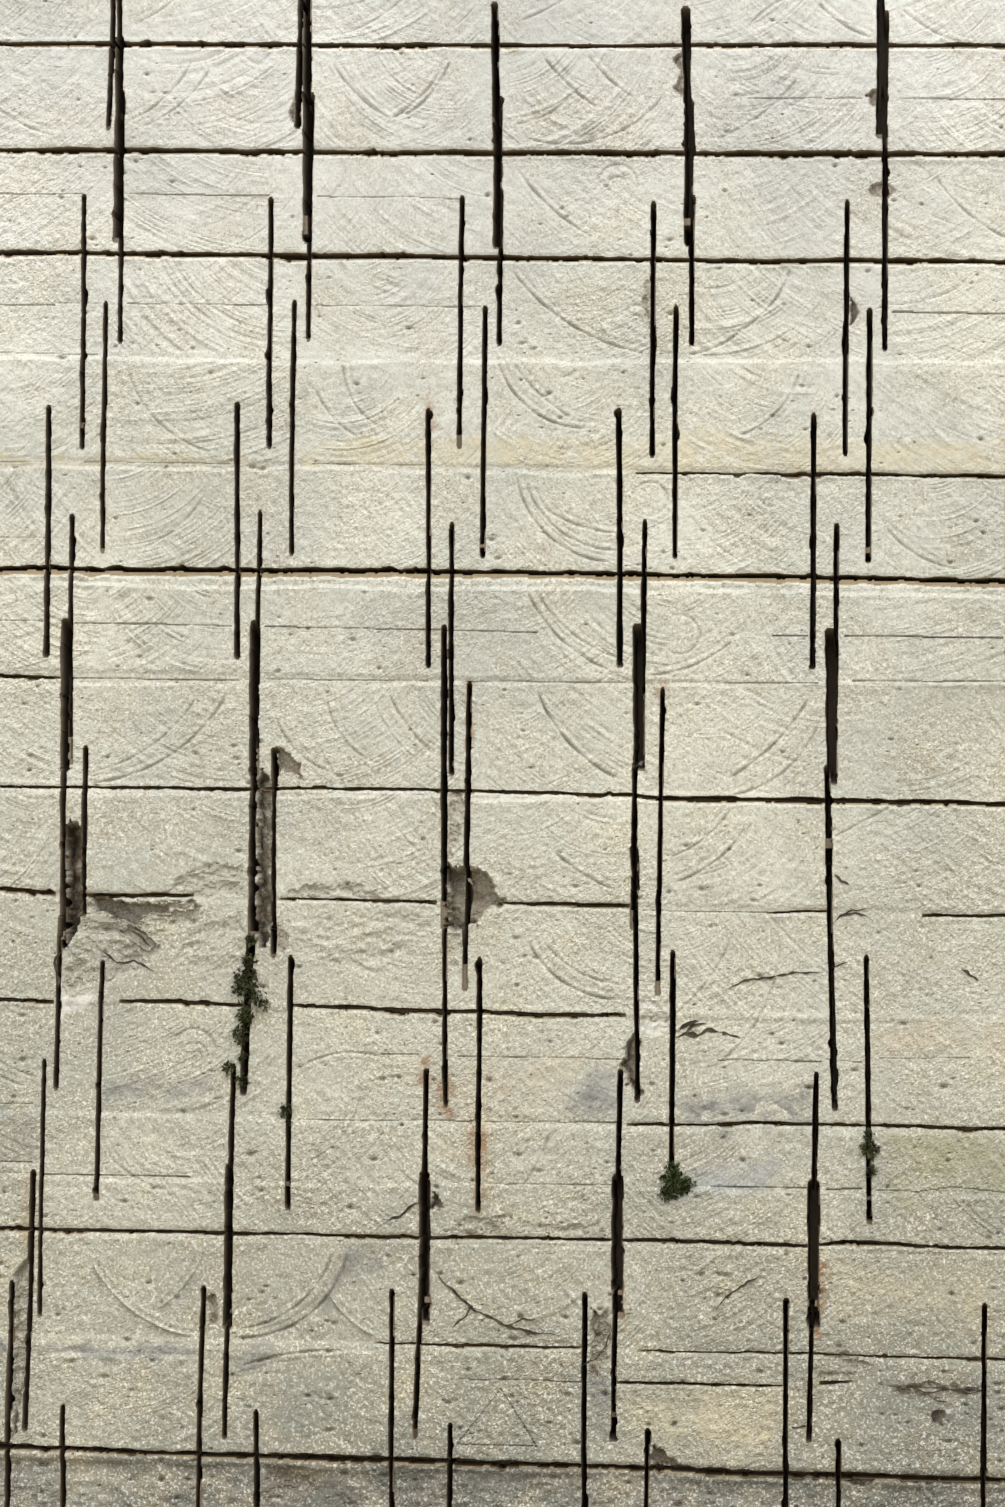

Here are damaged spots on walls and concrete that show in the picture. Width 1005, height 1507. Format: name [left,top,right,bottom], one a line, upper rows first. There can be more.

water stain [662,1065,826,1212]